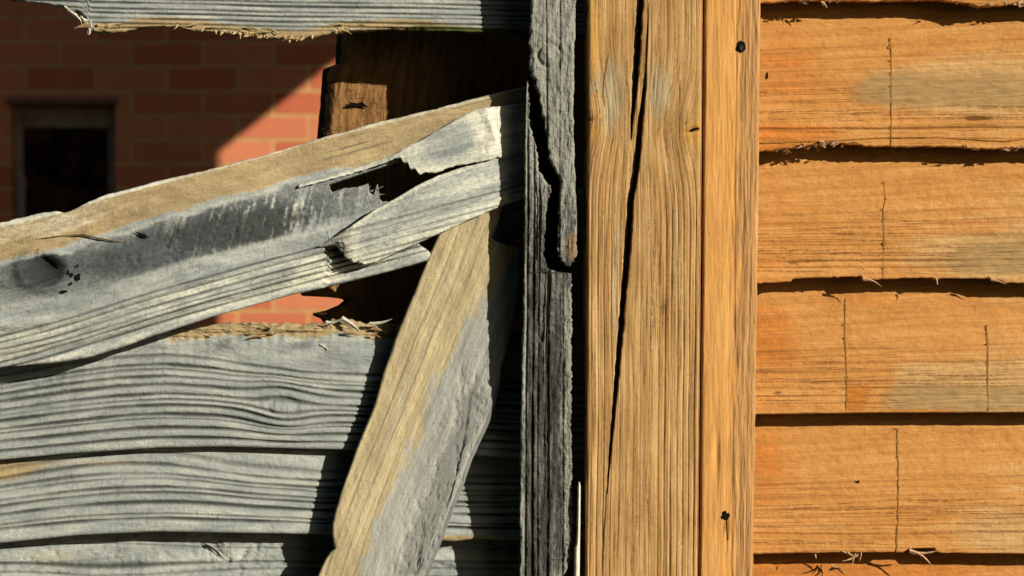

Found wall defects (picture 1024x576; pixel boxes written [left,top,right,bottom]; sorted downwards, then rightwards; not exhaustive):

crack [760,38,1024,145]
crack [880,182,888,278]
peeling [325,316,391,333]
crack [587,0,649,576]
crack [841,299,849,412]
crack [983,325,991,411]
crack [894,428,902,552]